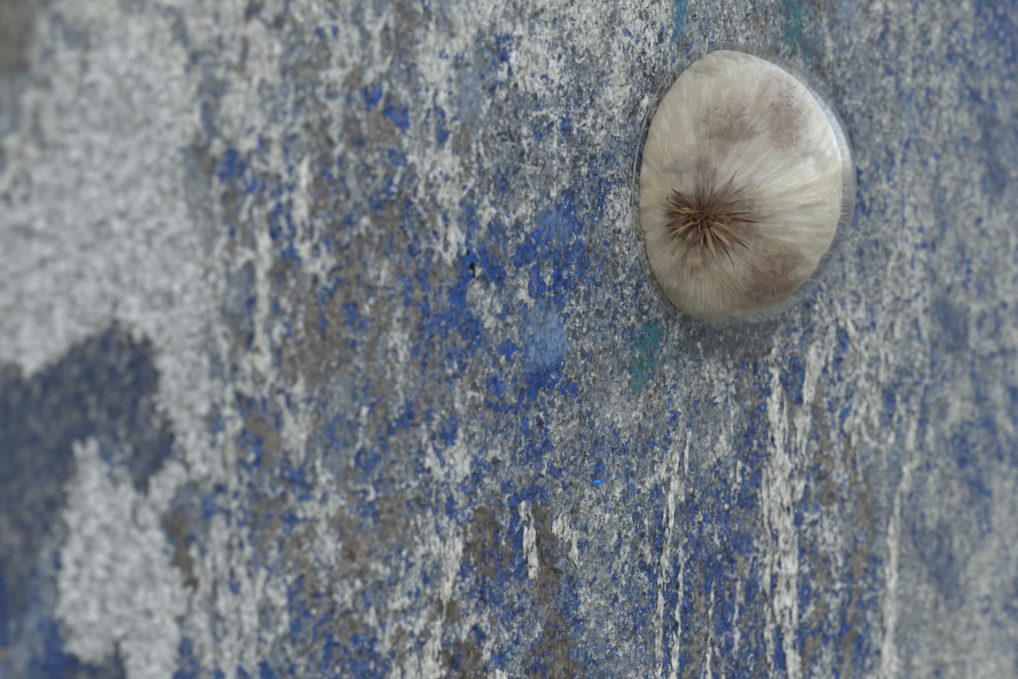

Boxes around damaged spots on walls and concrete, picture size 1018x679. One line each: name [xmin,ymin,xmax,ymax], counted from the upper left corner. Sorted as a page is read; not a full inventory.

spalling [231,0,287,96]
spalling [457,148,477,216]
flaking render [0,15,414,679]
spalling [375,576,493,679]
spalling [457,500,515,581]
spalling [513,501,587,679]
spalling [678,565,706,679]
spalling [799,376,877,679]